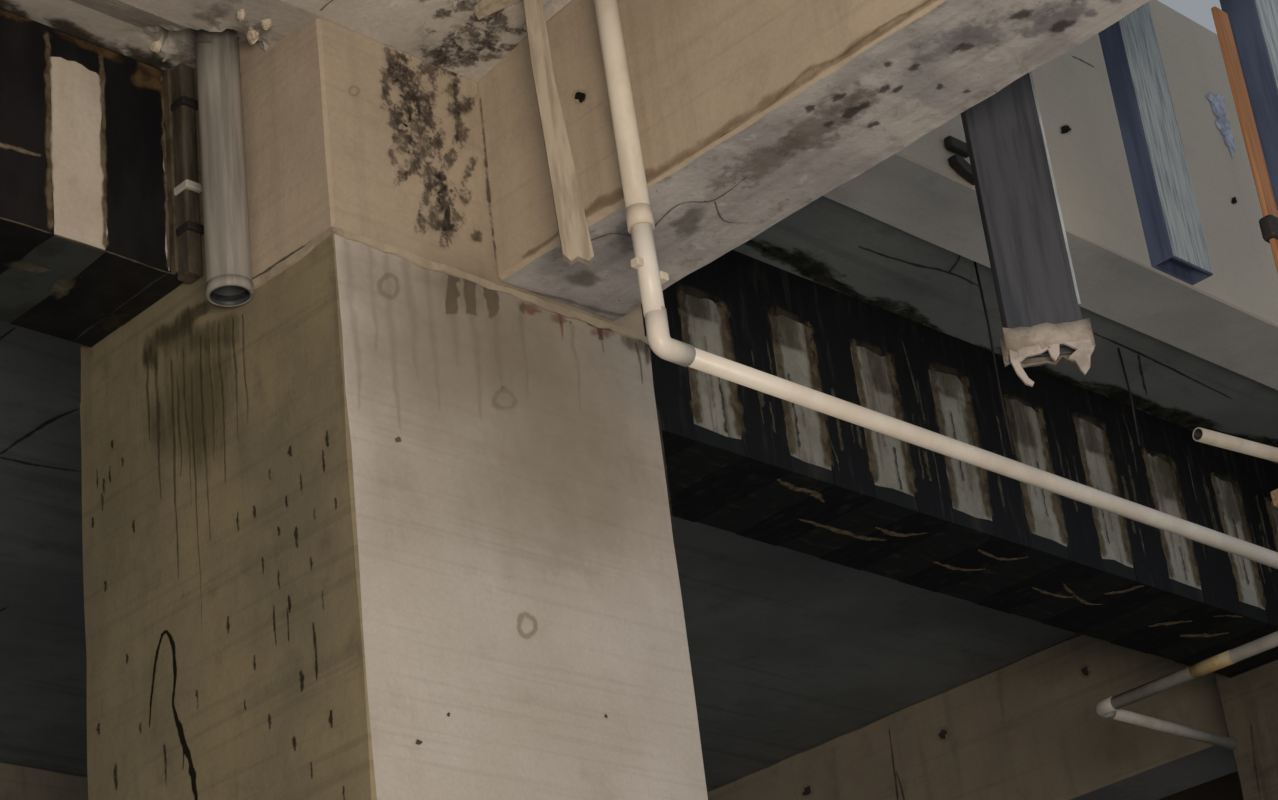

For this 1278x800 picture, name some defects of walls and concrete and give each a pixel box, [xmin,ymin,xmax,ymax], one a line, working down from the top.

water stain [381,1,527,246]
water stain [145,338,248,554]
crack [149,630,198,800]